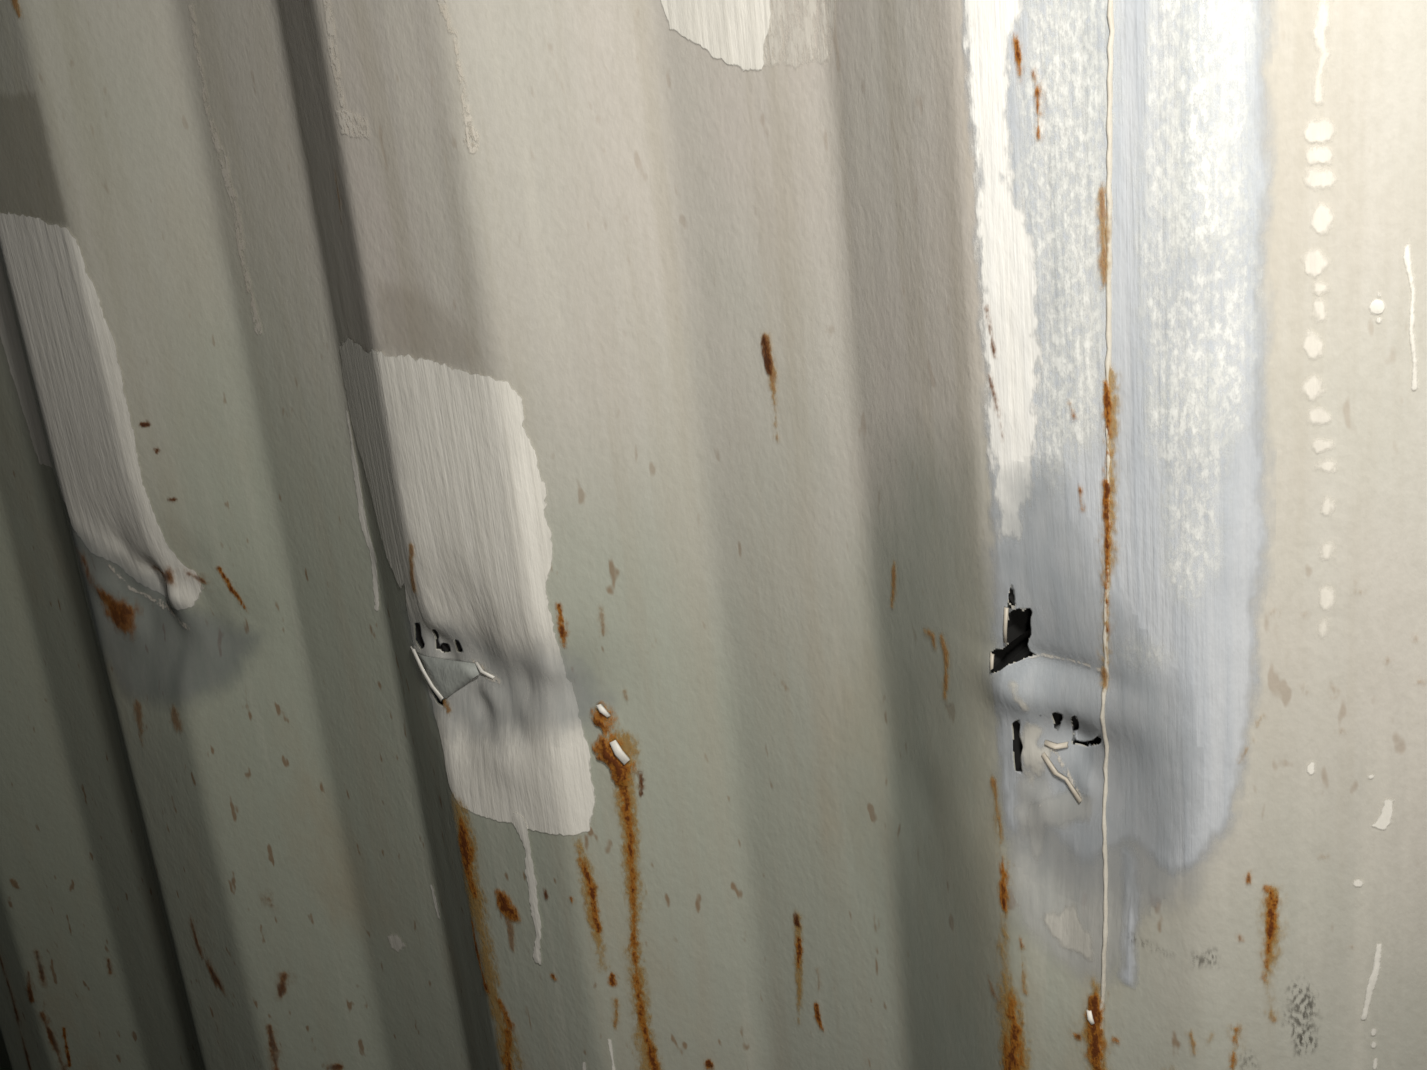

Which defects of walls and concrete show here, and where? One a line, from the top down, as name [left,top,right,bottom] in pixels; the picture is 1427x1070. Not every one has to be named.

corrosion [761,334,776,404]
corrosion [83,558,135,633]
peeling [1011,682,1050,780]
corrosion [452,801,521,1070]
corrosion [570,702,661,1070]
corrosion [999,860,1008,912]
corrosion [1246,873,1279,975]
corrosion [998,930,1029,1070]
corrosion [1073,981,1119,1070]